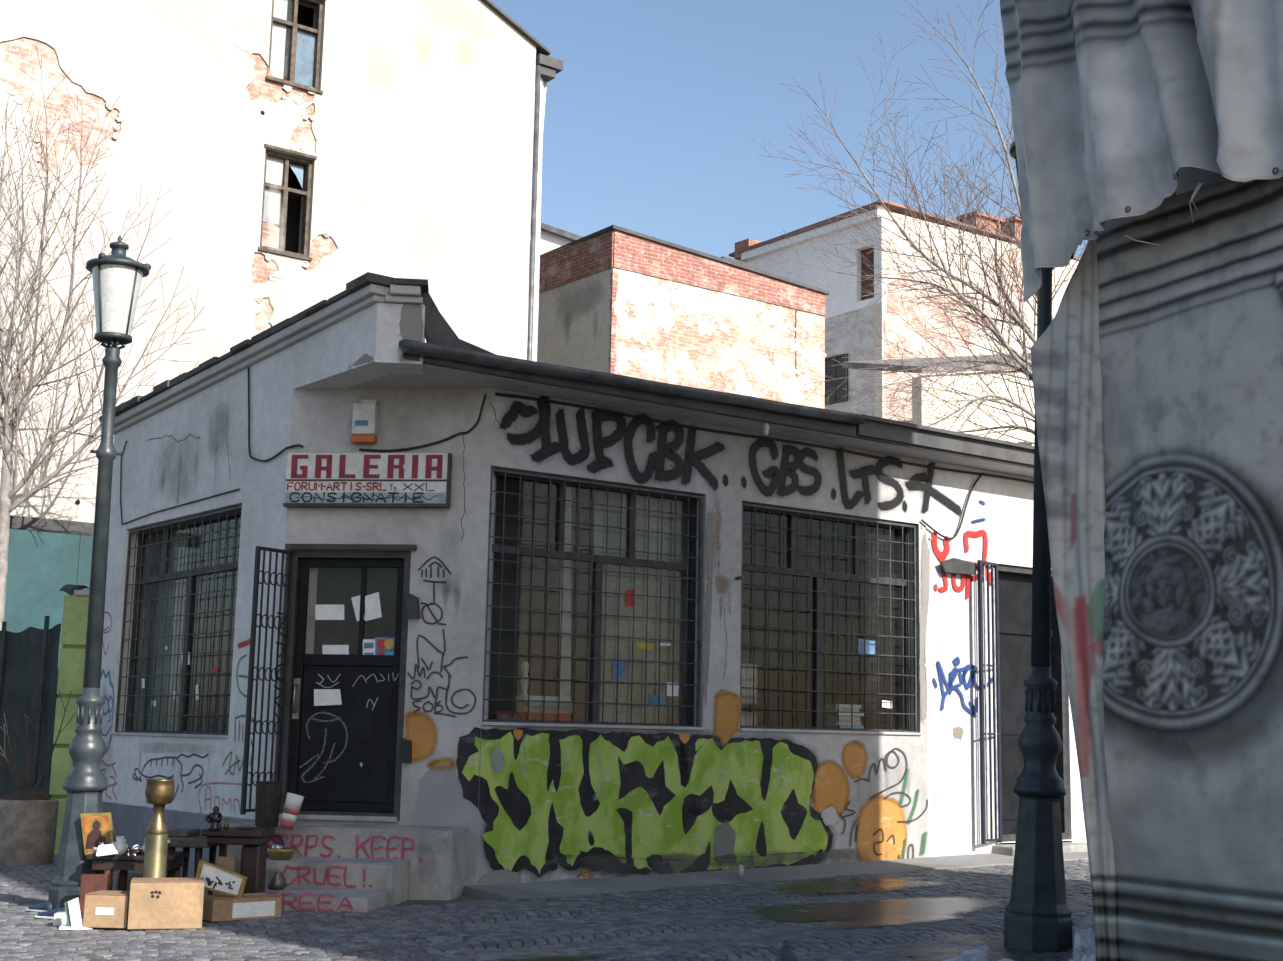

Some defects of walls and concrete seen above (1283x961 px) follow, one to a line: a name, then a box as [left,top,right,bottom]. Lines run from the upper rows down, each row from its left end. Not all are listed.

peeling [0,37,124,175]
peeling [246,54,317,153]
peeling [251,252,283,331]
peeling [301,230,338,271]
peeling [614,269,827,398]